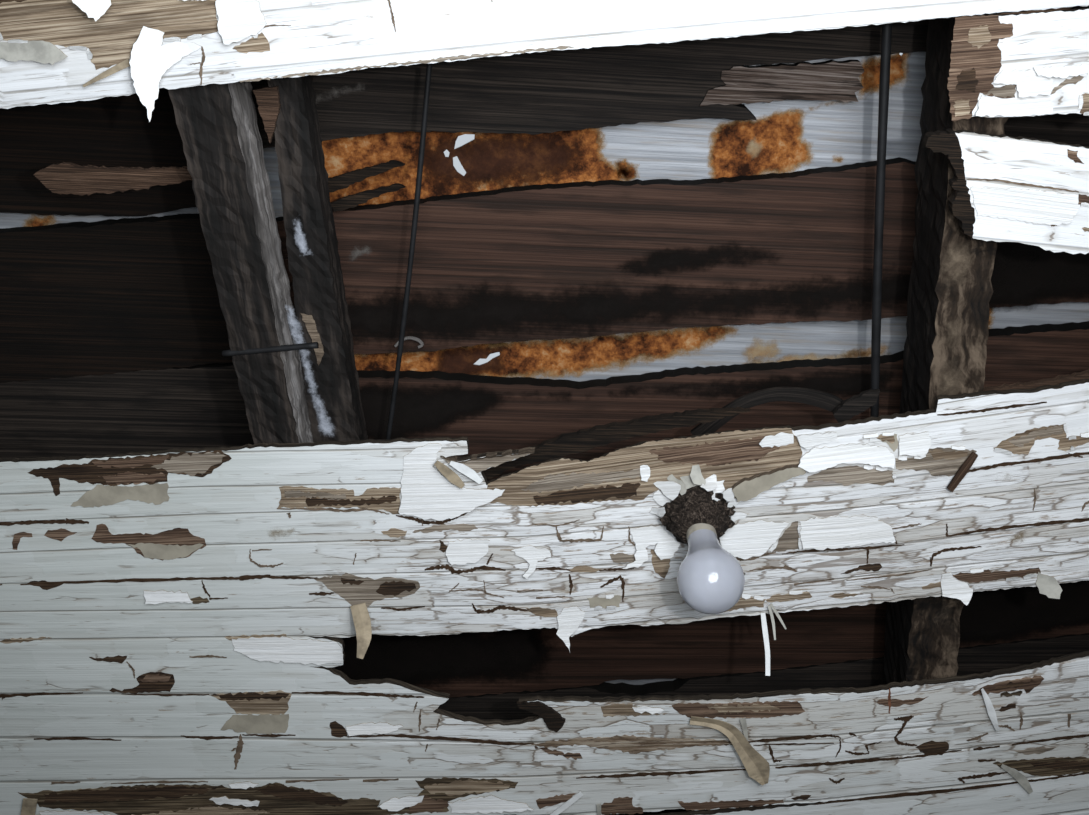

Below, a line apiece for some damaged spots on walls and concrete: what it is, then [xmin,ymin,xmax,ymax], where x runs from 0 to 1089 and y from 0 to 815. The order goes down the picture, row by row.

peeling [0,0,218,70]
peeling [947,14,1017,121]
corrosion [322,128,636,206]
corrosion [710,110,810,179]
corrosion [354,326,733,377]
peeling [28,450,232,507]
peeling [92,524,206,561]
peeling [278,486,401,514]
peeling [487,428,977,507]
crack [735,452,1089,593]
crack [576,688,1089,805]
peeling [18,777,576,815]